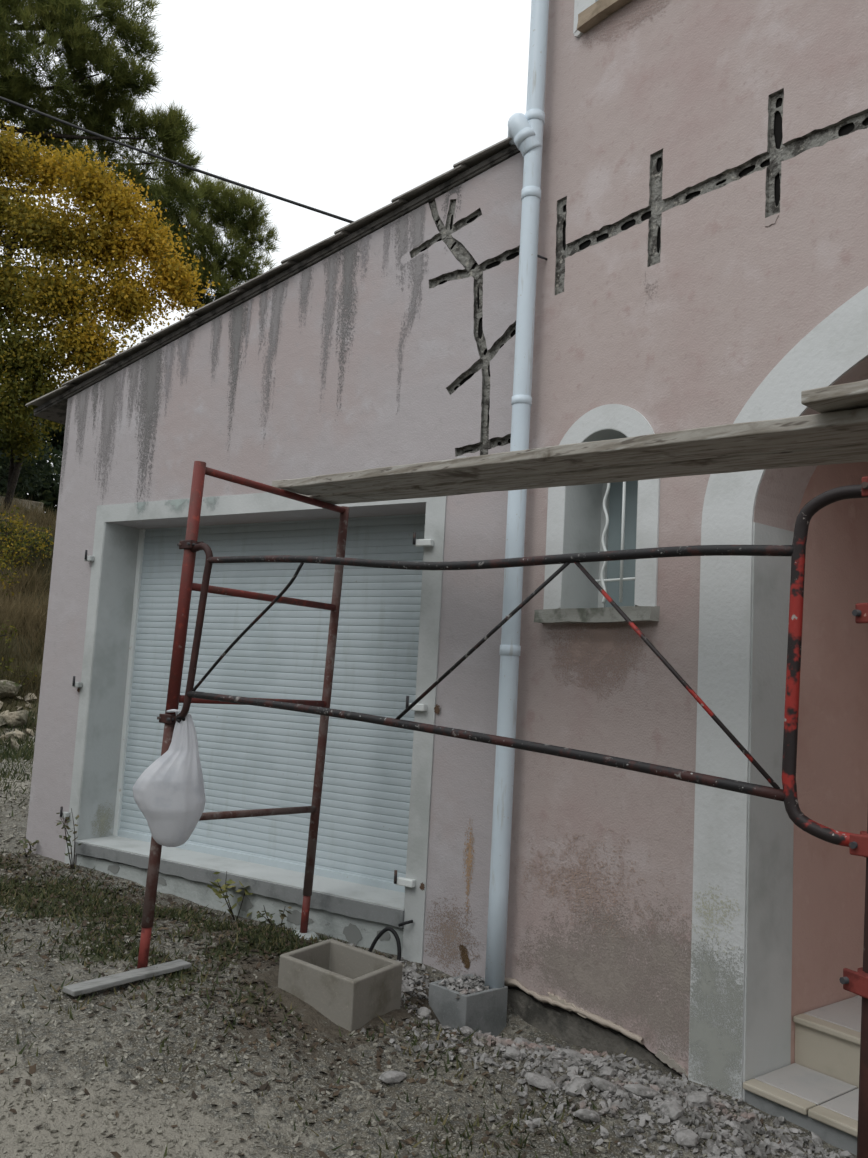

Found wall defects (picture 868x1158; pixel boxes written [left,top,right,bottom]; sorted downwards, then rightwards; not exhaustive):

leakage [210,205,429,450]
leakage [60,330,195,523]
leakage [424,896,481,977]